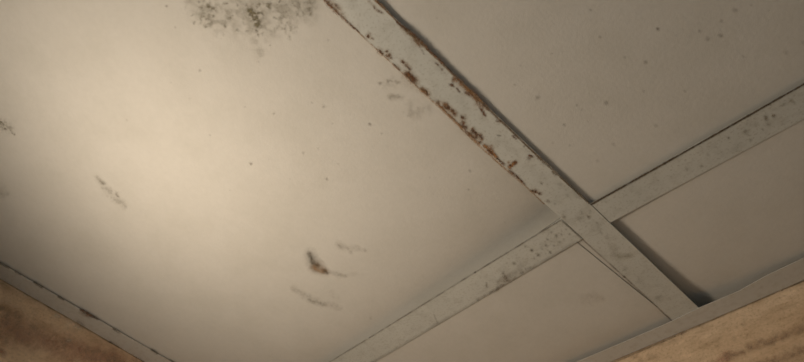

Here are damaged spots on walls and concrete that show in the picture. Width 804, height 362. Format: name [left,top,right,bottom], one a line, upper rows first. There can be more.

corrosion [324,0,585,204]